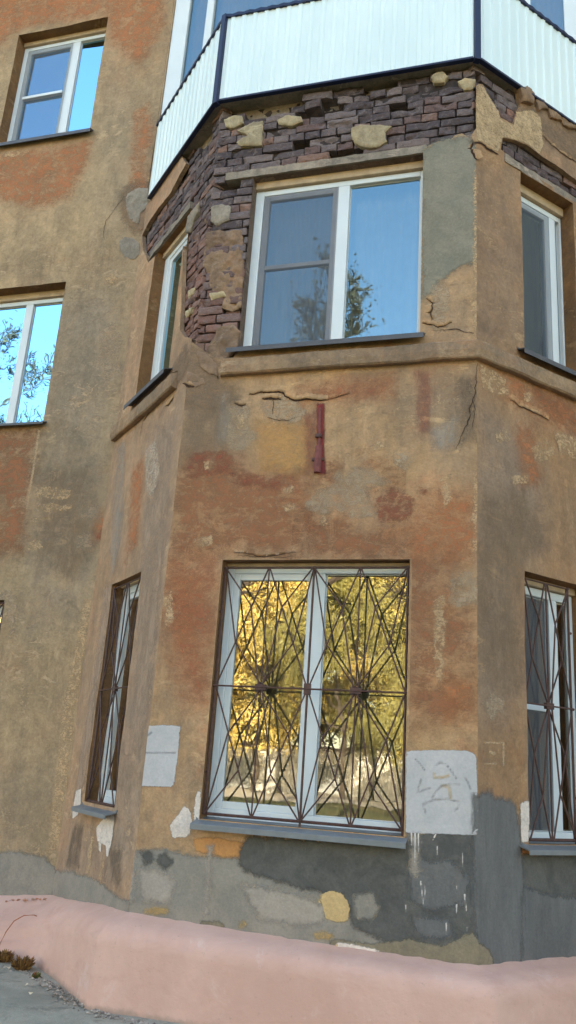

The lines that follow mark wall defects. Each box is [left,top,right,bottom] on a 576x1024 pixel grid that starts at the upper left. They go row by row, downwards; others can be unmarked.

spalling [120,64,576,359]
crack [422,295,472,333]
crack [234,385,350,421]
crack [457,365,478,446]
crack [510,394,549,420]